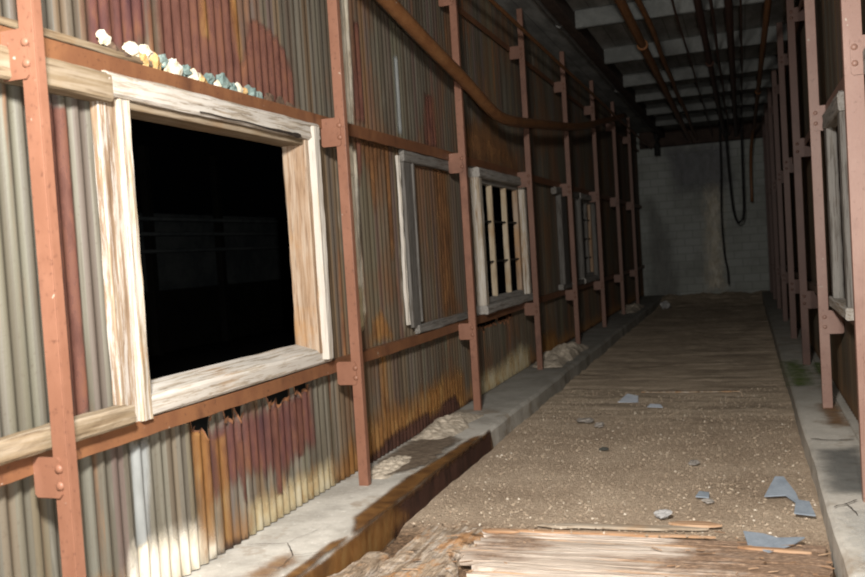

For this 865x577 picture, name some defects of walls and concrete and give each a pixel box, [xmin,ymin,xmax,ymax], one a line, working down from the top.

rust [85,0,144,47]
rust [157,0,294,105]
rust [368,356,464,463]
rust [191,389,315,548]
rust [251,431,493,577]